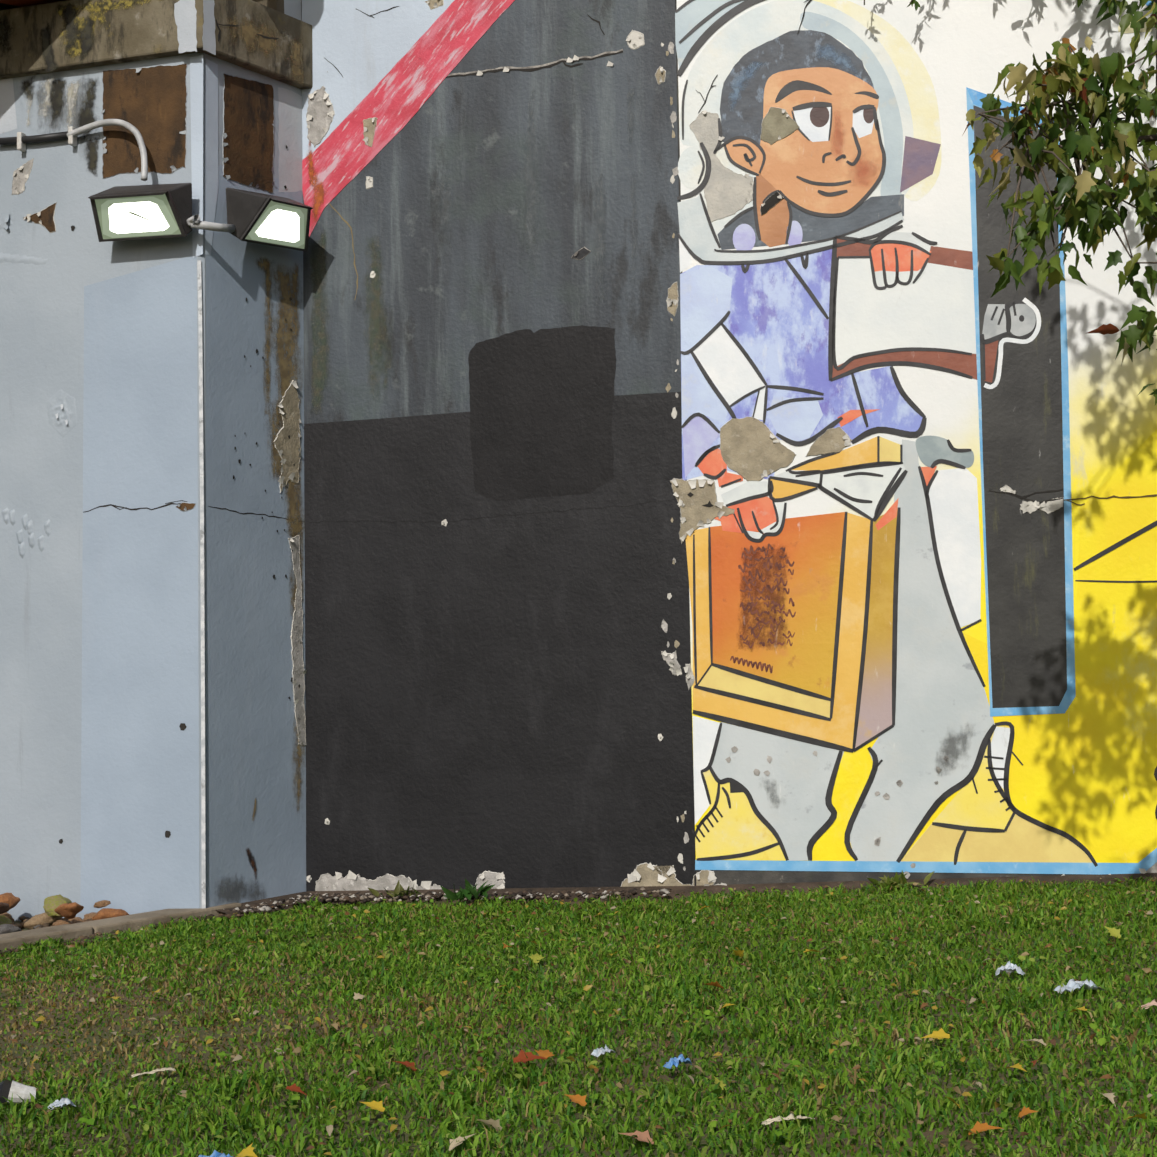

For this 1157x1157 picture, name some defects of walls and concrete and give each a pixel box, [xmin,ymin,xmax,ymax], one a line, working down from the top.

crack [446,14,623,78]
spalling [626,30,645,50]
leakage [23,0,149,174]
peeling [101,63,188,179]
peeling [222,73,288,194]
peeling [760,107,800,145]
peeling [689,110,784,223]
peeling [720,417,852,481]
spalling [670,478,735,543]
spalling [1000,485,1064,514]
peeling [306,870,443,891]
peeling [475,871,505,889]